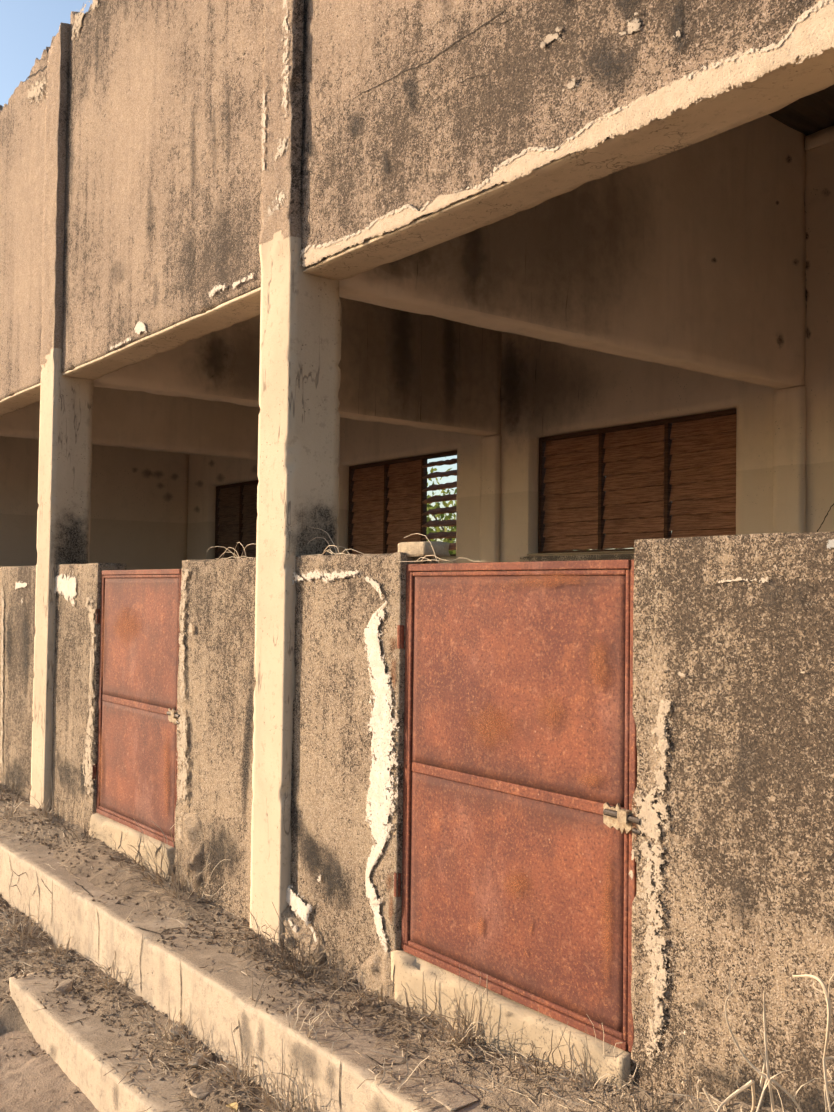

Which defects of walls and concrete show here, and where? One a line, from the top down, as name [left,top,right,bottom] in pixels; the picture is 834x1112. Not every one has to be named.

damp [300,0,312,173]
damp [403,74,416,111]
crack [351,1,520,101]
flaking render [299,0,834,267]
flaking render [54,571,97,804]
flaking render [286,885,319,942]
damp [290,758,349,904]
flaking render [292,569,399,952]
flaking render [629,671,689,1061]